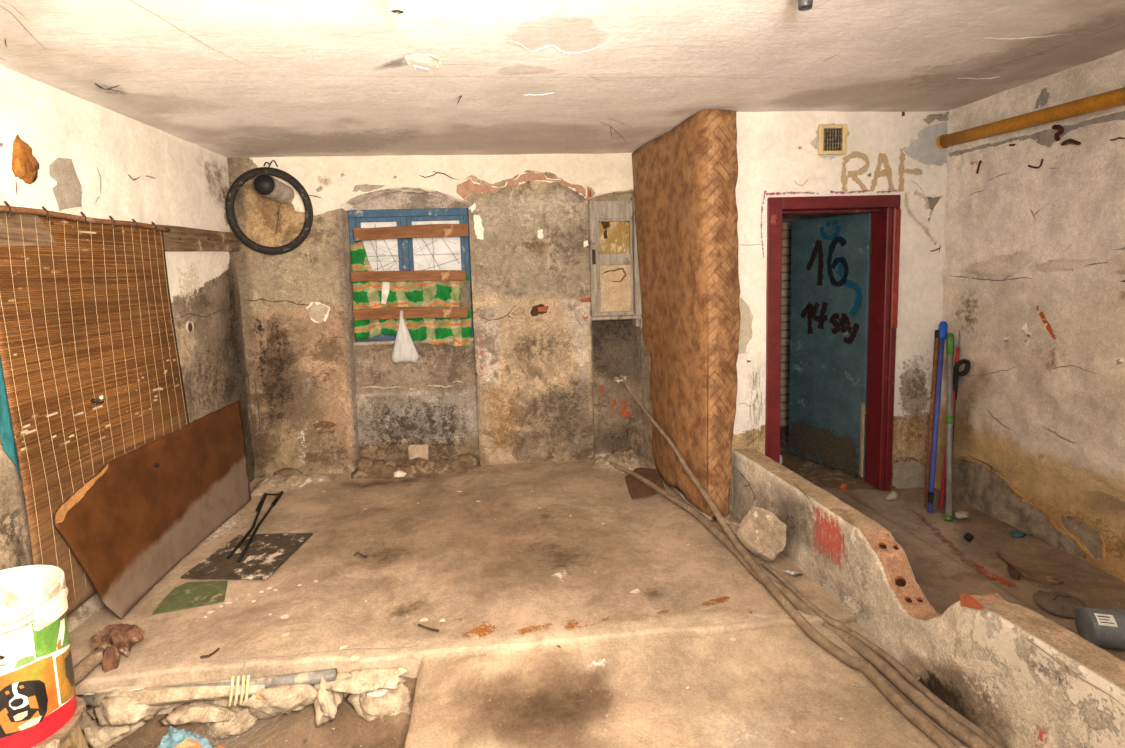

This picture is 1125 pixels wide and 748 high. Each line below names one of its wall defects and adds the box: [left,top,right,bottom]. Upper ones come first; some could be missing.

peeling [1033,87,1051,111]
peeling [902,108,1125,169]
flaking render [456,172,595,240]
water stain [256,319,311,420]
water stain [368,386,464,454]
spalling [895,576,923,602]
rust [459,618,495,638]
rust [516,617,581,635]